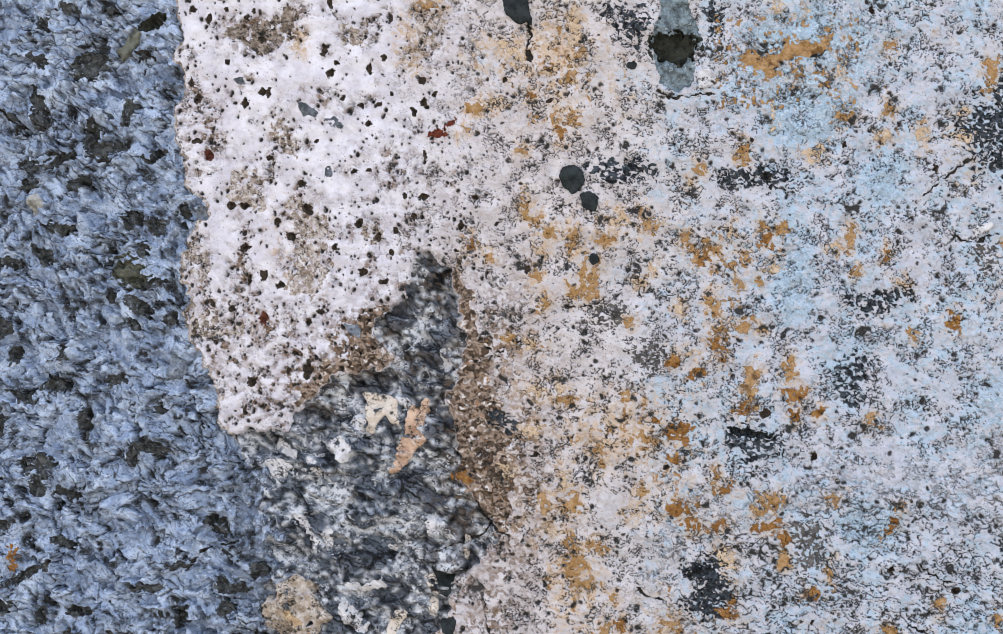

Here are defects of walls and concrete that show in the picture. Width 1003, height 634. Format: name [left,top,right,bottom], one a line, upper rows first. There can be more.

spalling [172,0,515,634]